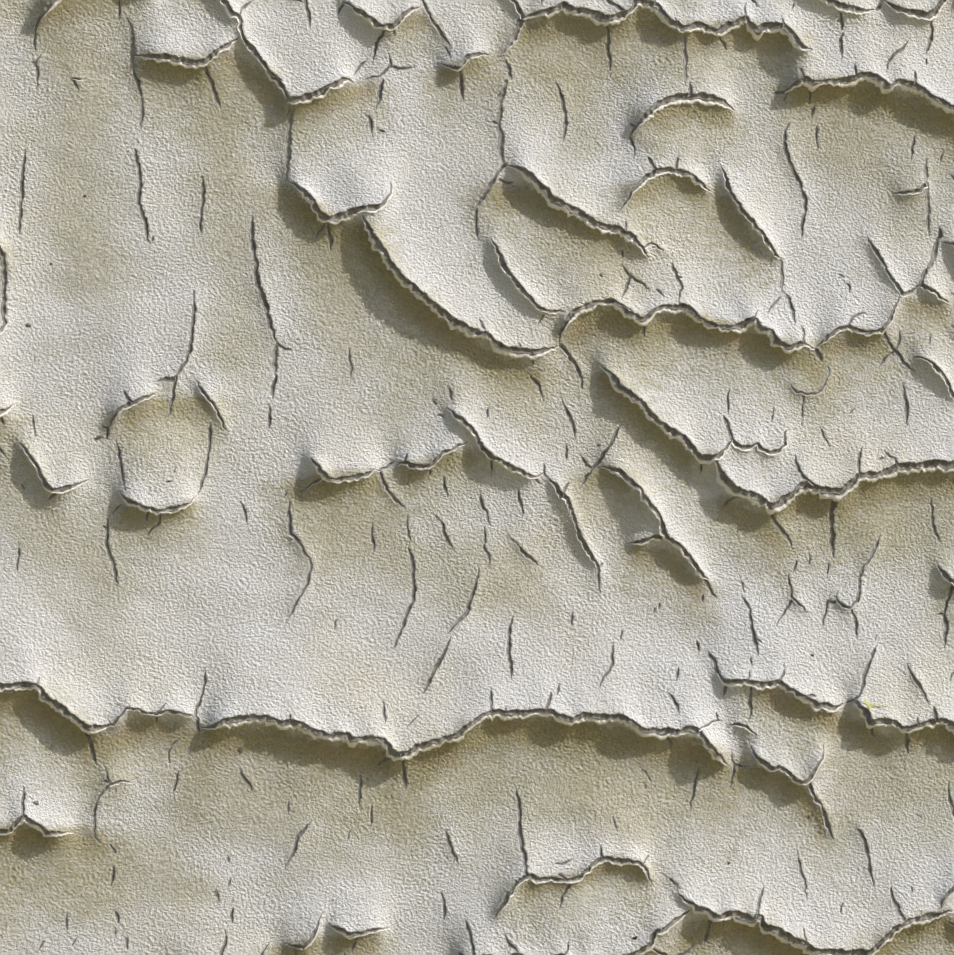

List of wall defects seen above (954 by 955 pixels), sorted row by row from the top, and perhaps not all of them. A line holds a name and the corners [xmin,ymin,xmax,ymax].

crack [31,0,62,85]
crack [0,153,26,334]
crack [102,0,954,649]
crack [0,404,88,500]
crack [423,493,544,694]
crack [0,581,954,887]
crack [115,910,128,949]
crack [214,854,233,955]
crack [261,912,386,955]
crack [441,893,475,955]
crack [495,791,954,955]